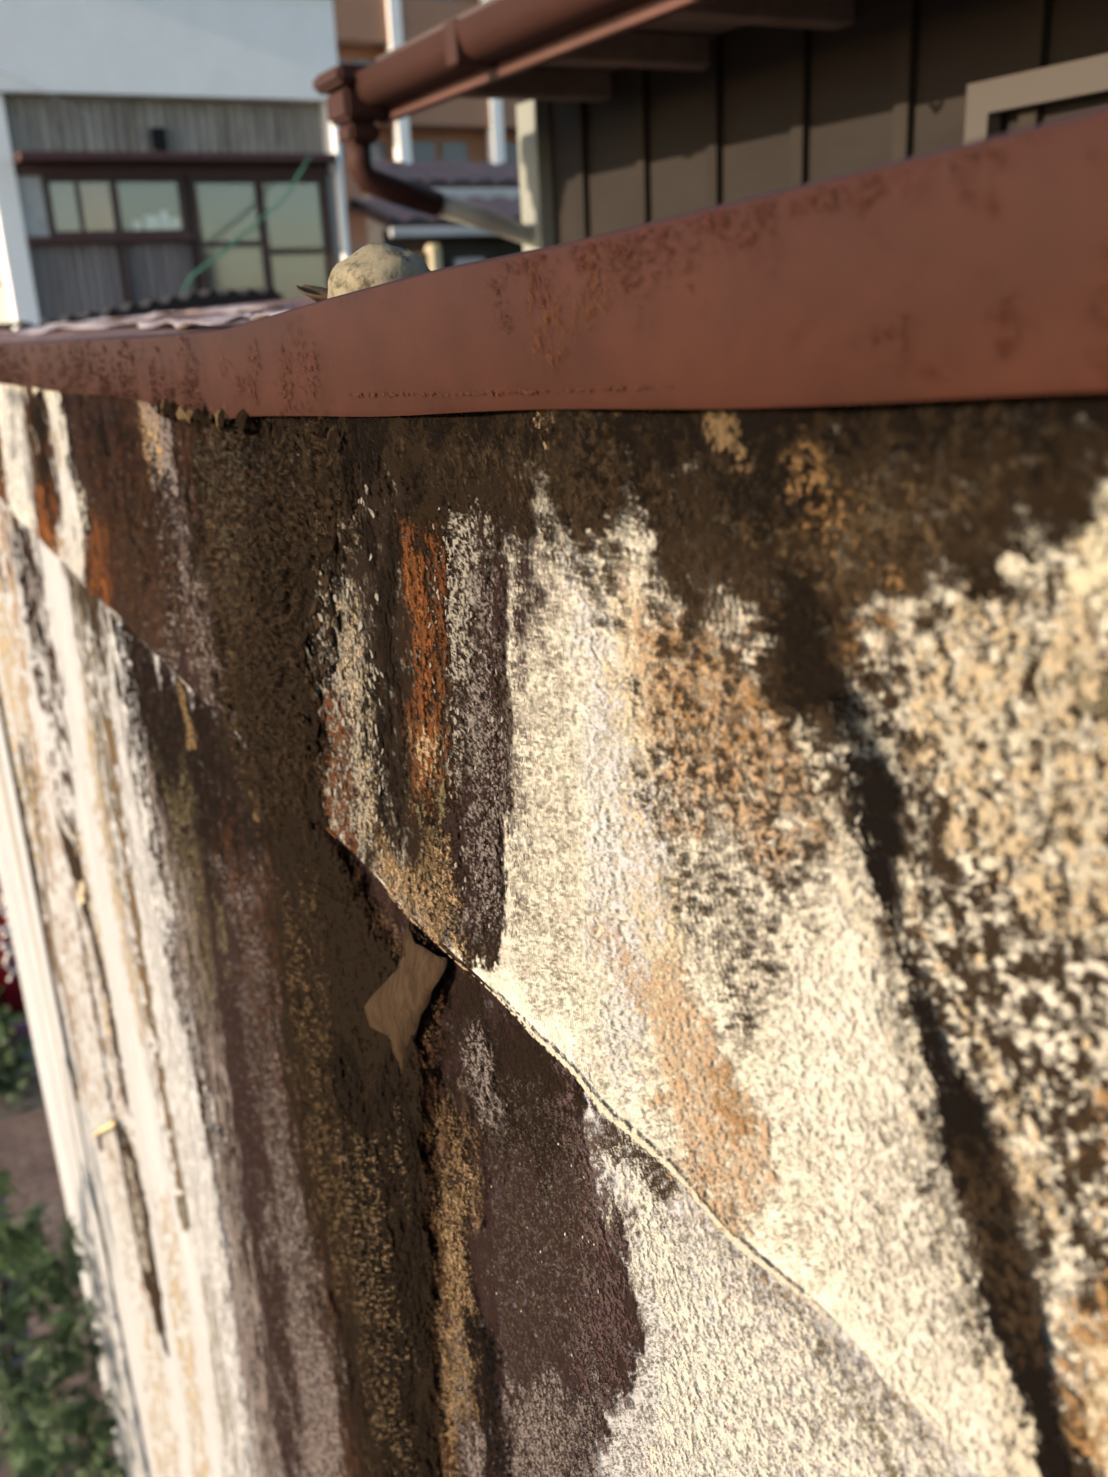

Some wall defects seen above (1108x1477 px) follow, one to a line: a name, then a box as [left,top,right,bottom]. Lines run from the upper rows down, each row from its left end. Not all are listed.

corrosion [191,418,418,1090]
corrosion [401,512,452,817]
damp [0,383,1108,1477]
crack [764,566,1072,1477]